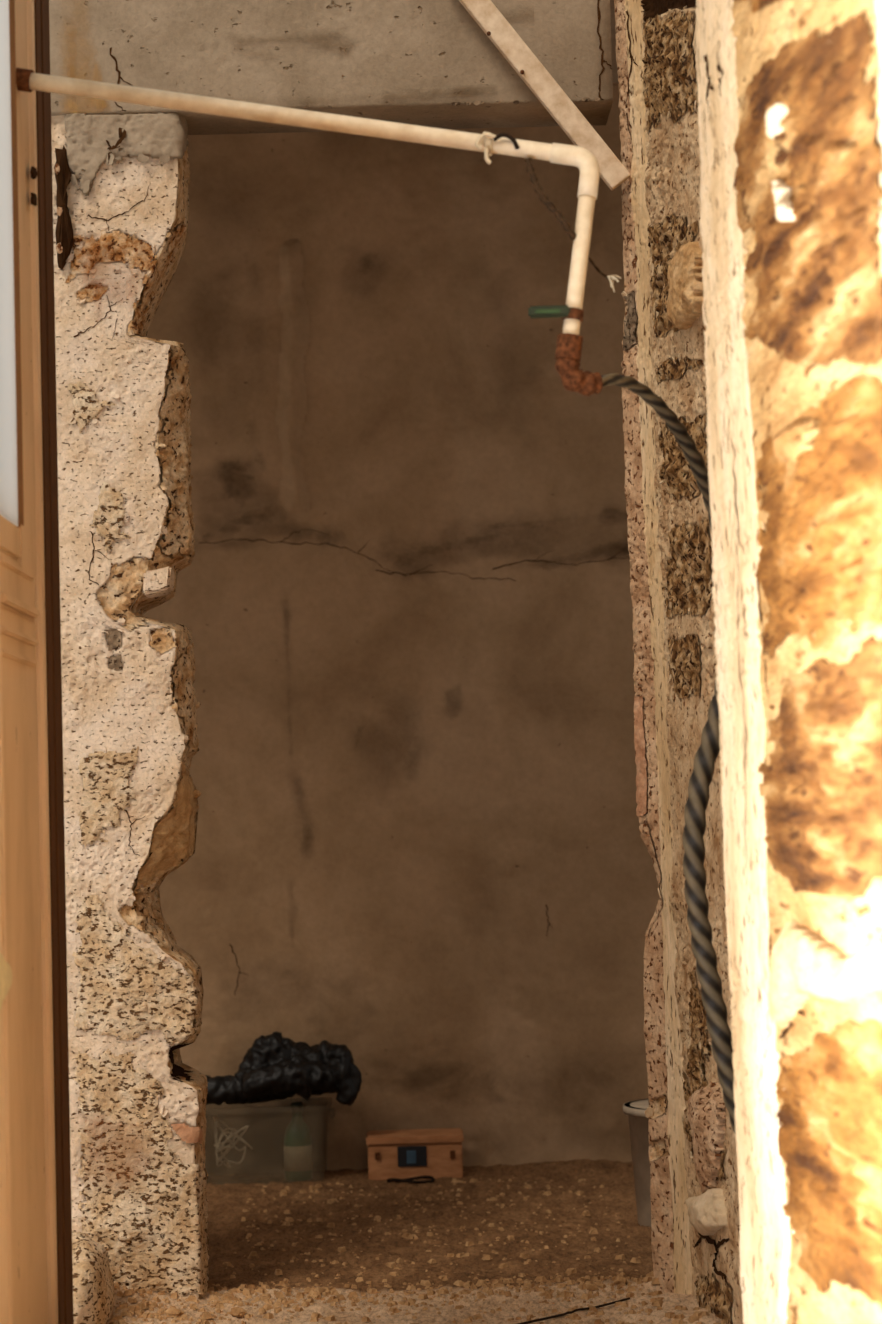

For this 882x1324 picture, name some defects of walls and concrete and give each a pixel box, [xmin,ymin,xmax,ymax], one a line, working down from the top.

crack [110,47,133,111]
peeling [54,112,189,337]
spalling [67,381,120,433]
spalling [89,347,201,757]
crack [200,529,629,581]
spalling [78,746,139,847]
spalling [72,773,209,1297]